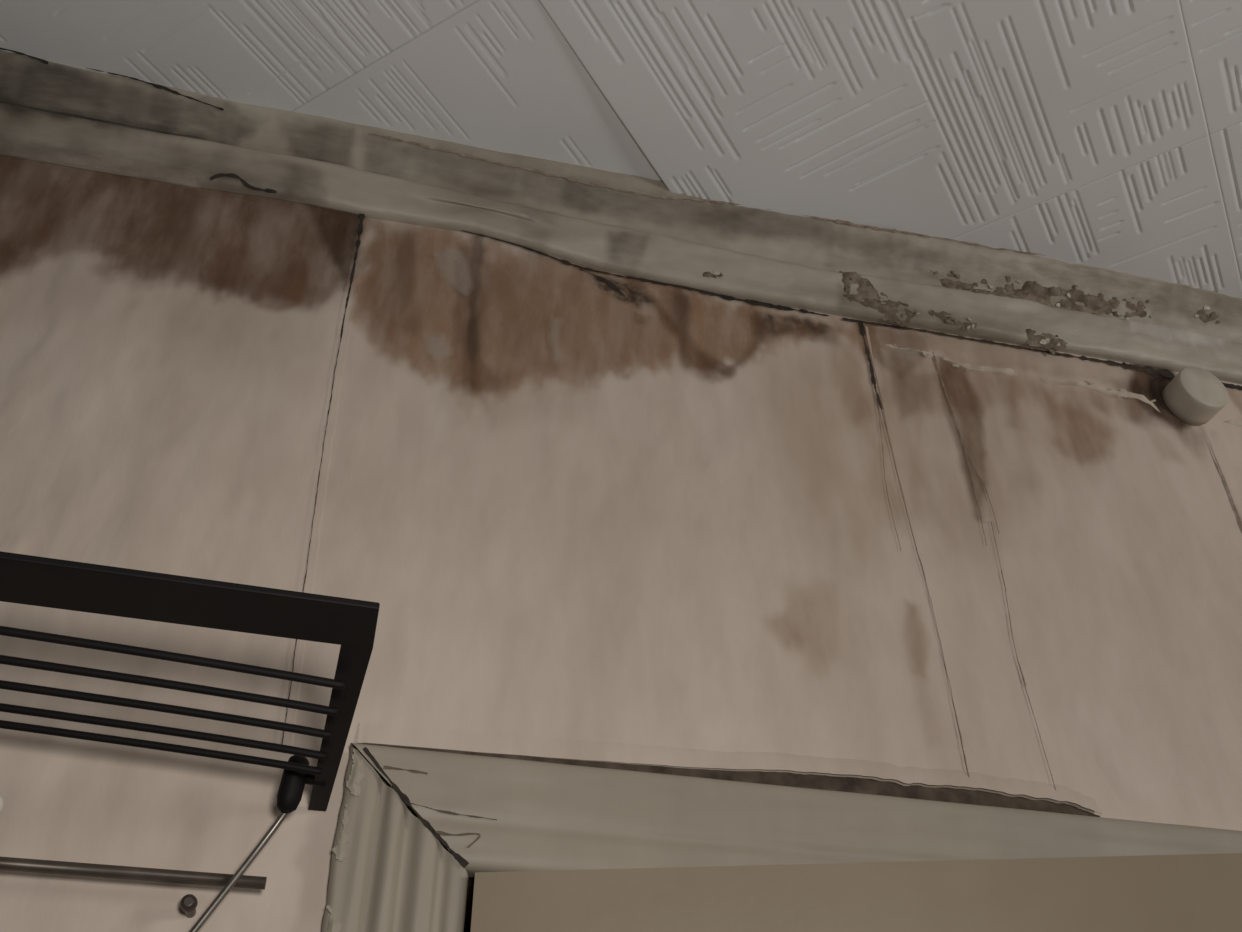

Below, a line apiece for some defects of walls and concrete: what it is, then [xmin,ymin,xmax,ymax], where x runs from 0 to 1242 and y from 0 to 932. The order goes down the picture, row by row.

leakage [0,142,360,302]
leakage [387,232,823,389]
flaking render [839,271,977,332]
flaking render [931,270,1151,320]
flaking render [1026,329,1068,355]
crack [1222,382,1242,390]